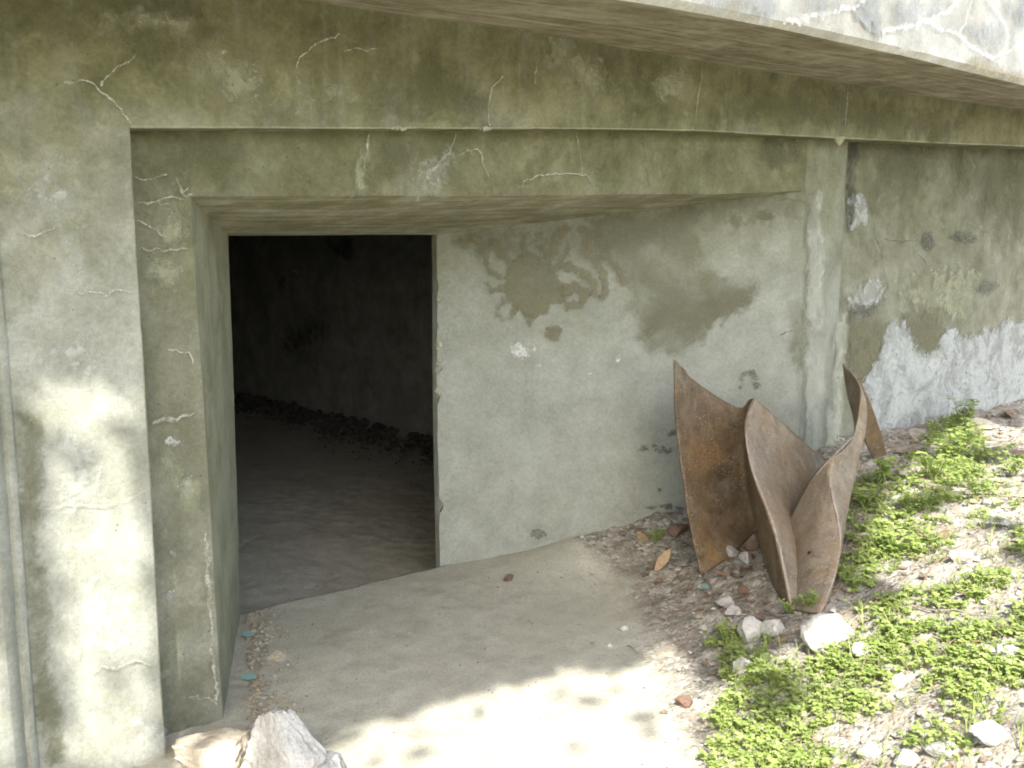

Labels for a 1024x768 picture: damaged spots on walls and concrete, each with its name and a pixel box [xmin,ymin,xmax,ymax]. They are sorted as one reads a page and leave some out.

crack [297,33,387,65]
crack [882,0,1024,60]
crack [66,59,132,123]
crack [137,174,192,252]
peeling [847,193,868,232]
water stain [460,224,627,327]
spalling [511,342,542,367]
water stain [544,325,562,341]
peeling [825,276,888,446]
peeling [862,269,1024,430]
crack [153,413,194,424]
crack [204,532,219,701]